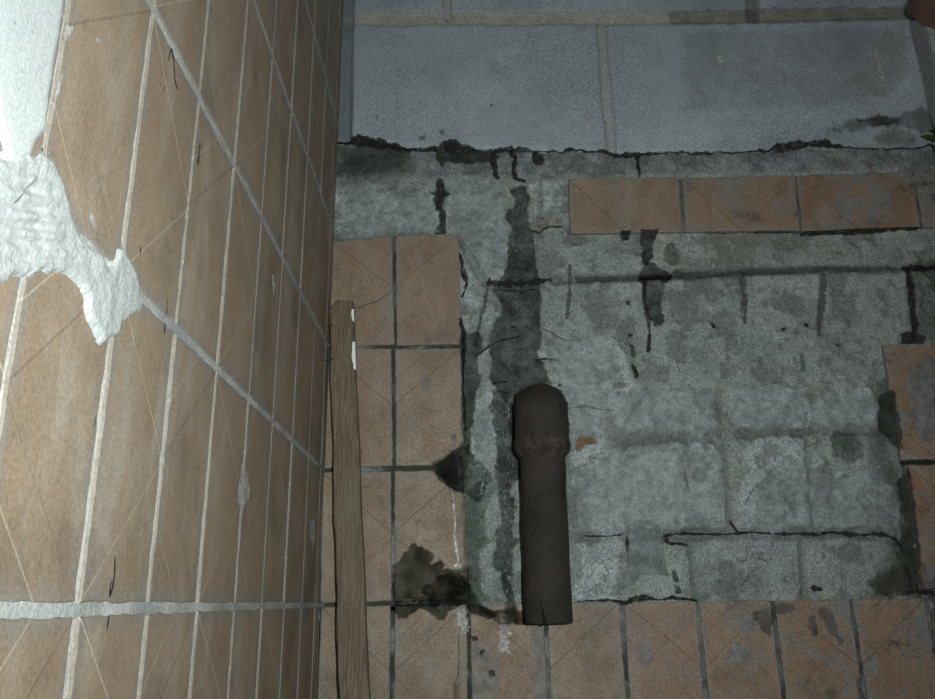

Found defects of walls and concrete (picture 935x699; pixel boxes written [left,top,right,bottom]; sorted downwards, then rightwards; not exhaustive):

crack [338,134,935,183]
leakage [620,229,673,352]
leakage [393,179,551,654]
flaking render [334,135,935,605]
crack [663,473,902,592]
crack [577,594,698,605]